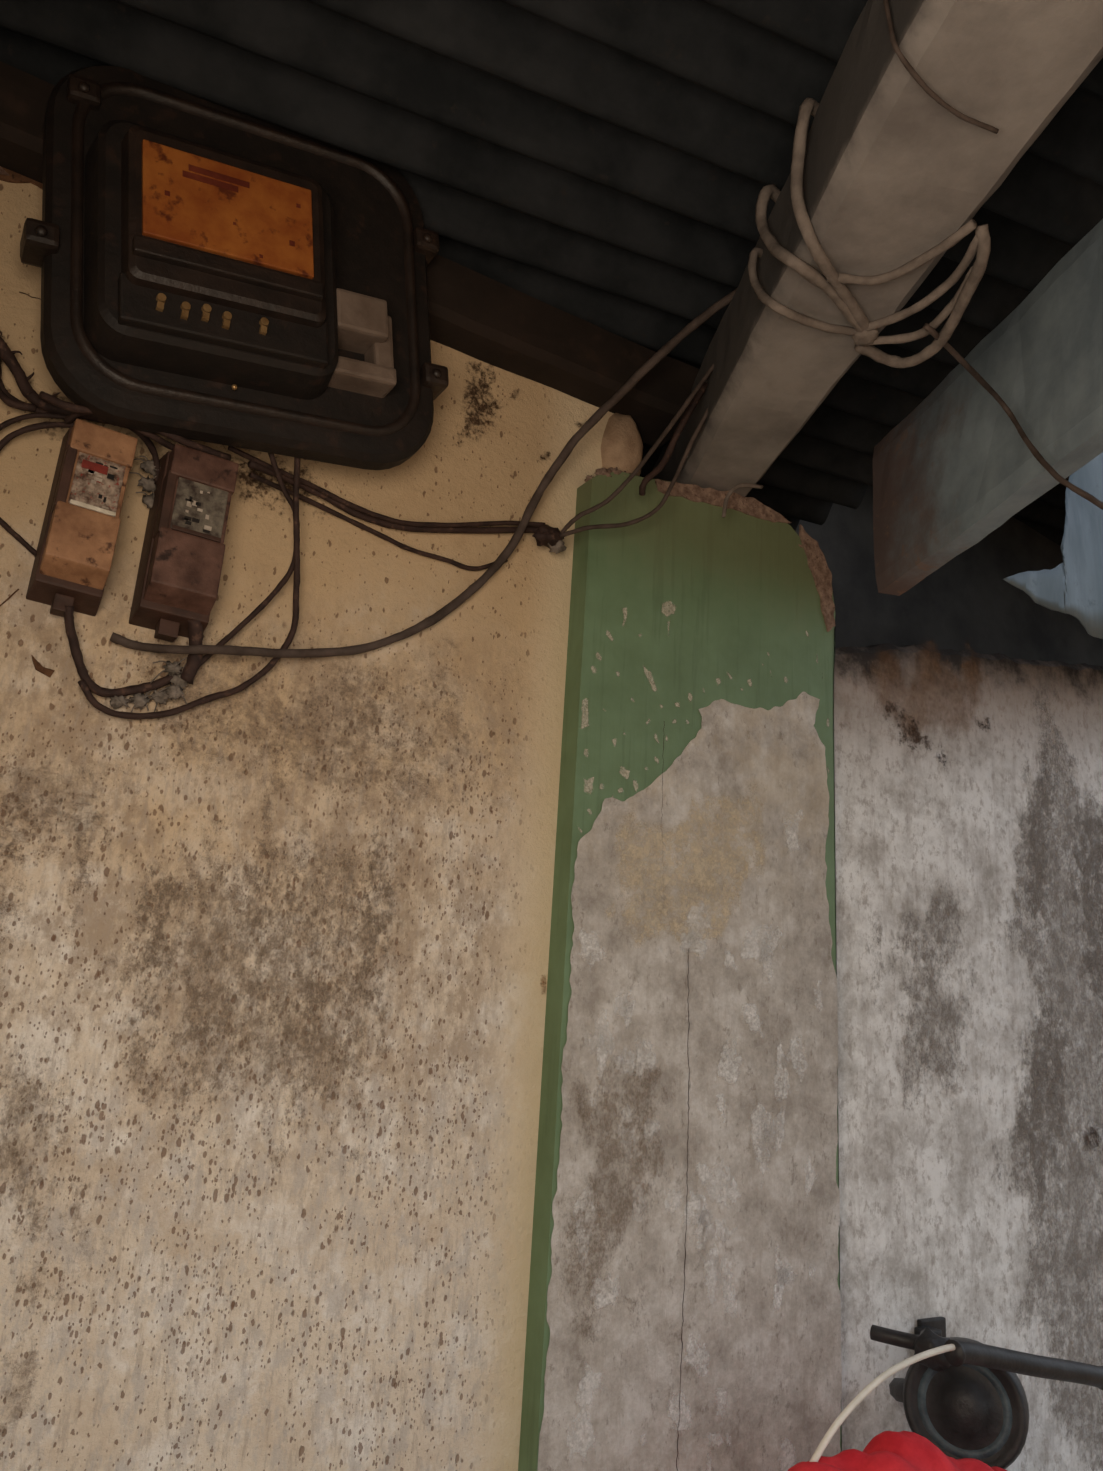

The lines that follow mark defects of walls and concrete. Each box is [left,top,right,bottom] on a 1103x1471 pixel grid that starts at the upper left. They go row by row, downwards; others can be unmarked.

spalling [584,467,631,482]
spalling [655,479,836,632]
water stain [0,1073,59,1201]
water stain [120,832,393,1113]
water stain [567,1068,664,1340]
peeling [537,667,842,1471]
water stain [897,886,969,1092]
water stain [999,695,1103,1366]
water stain [1045,1379,1103,1470]